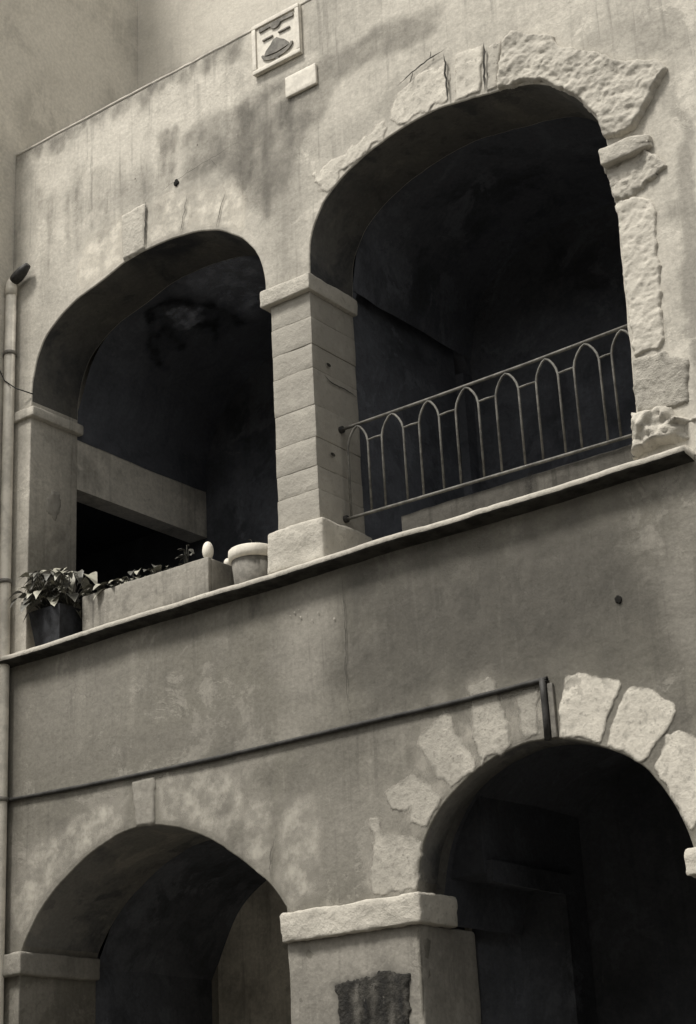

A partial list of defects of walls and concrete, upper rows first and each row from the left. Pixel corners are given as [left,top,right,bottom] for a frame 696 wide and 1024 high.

crack [402,51,448,98]
crack [480,44,488,88]
spalling [335,971,412,1024]